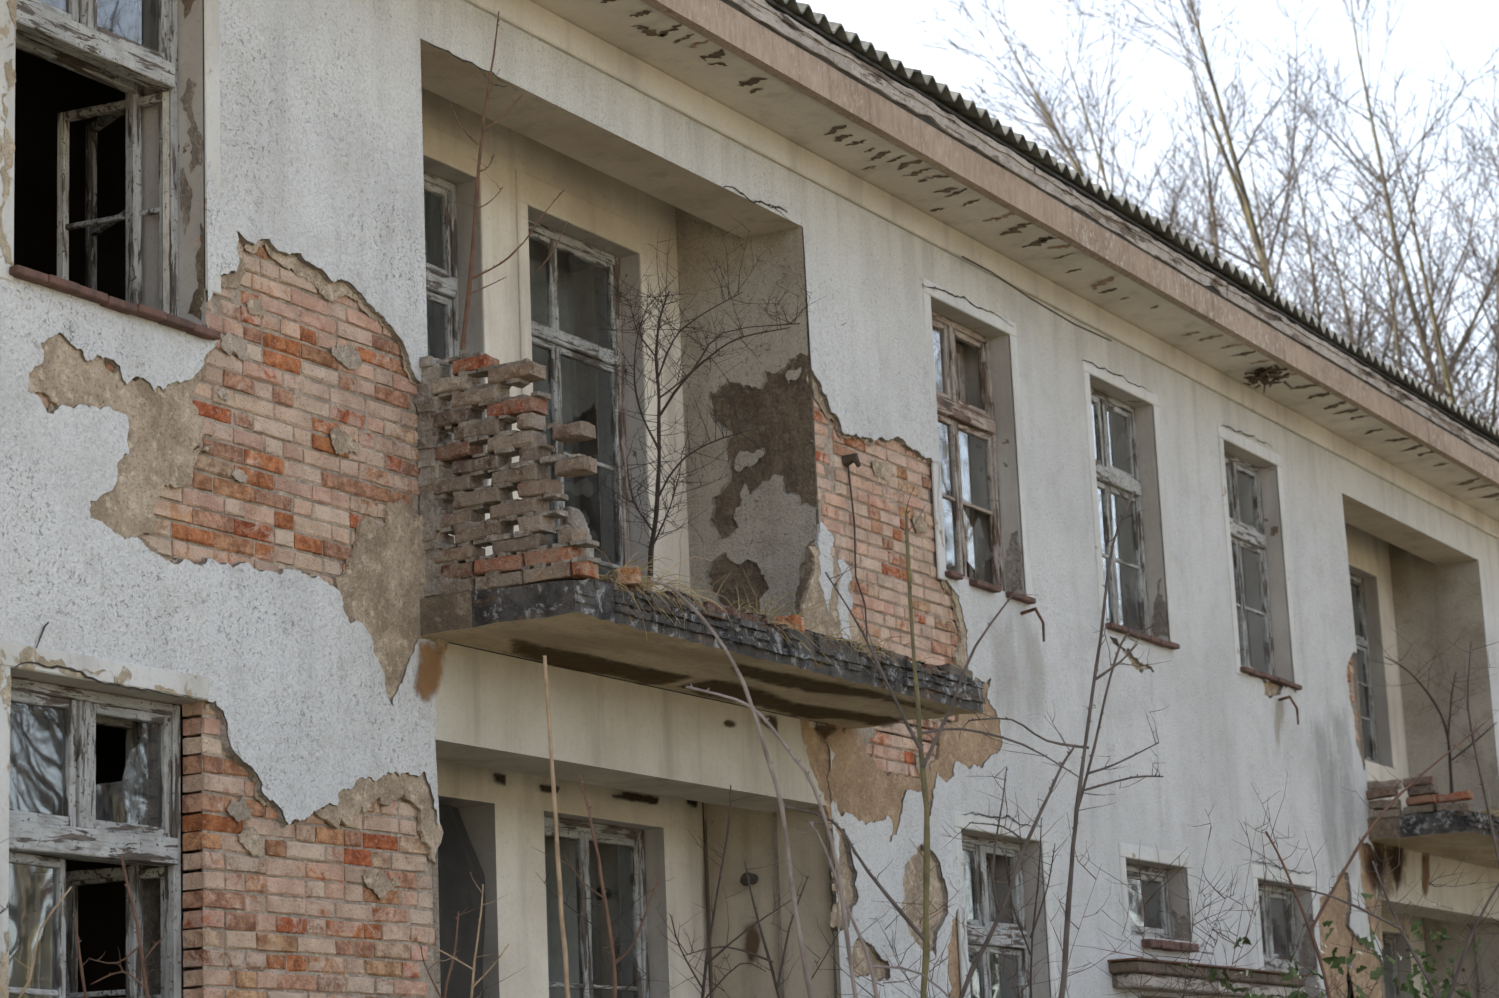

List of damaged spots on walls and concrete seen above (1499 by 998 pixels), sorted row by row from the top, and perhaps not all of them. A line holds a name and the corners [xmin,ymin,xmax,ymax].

peeling [182,0,195,19]
flaking render [28,77,448,707]
peeling [1,646,123,832]
flaking render [155,685,443,998]
flaking render [705,353,1003,998]
flaking render [1300,839,1385,998]